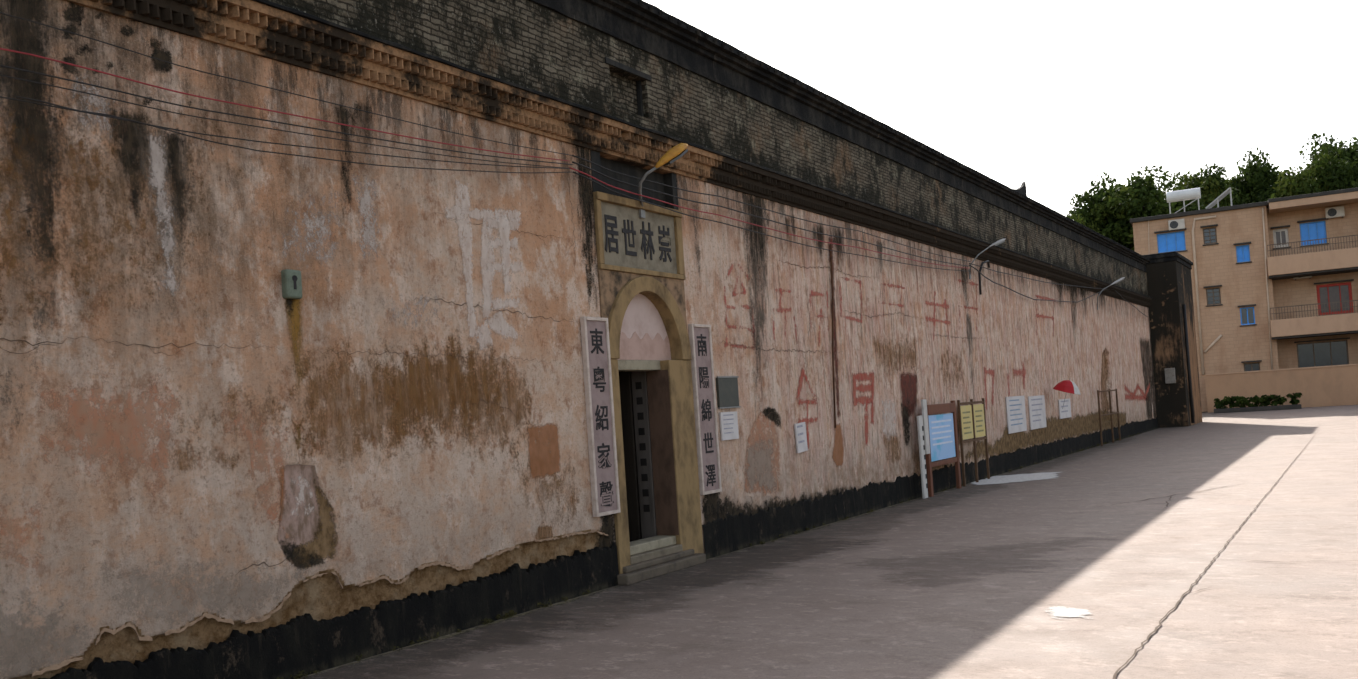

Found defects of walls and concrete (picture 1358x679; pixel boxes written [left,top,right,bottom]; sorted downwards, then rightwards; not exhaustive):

damp [0,0,201,330]
crack [0,337,565,366]
corrosion [286,299,301,385]
damp [194,335,532,462]
peeling [528,424,560,478]
damp [741,194,769,384]
damp [813,226,844,265]
flaking render [11,465,608,679]